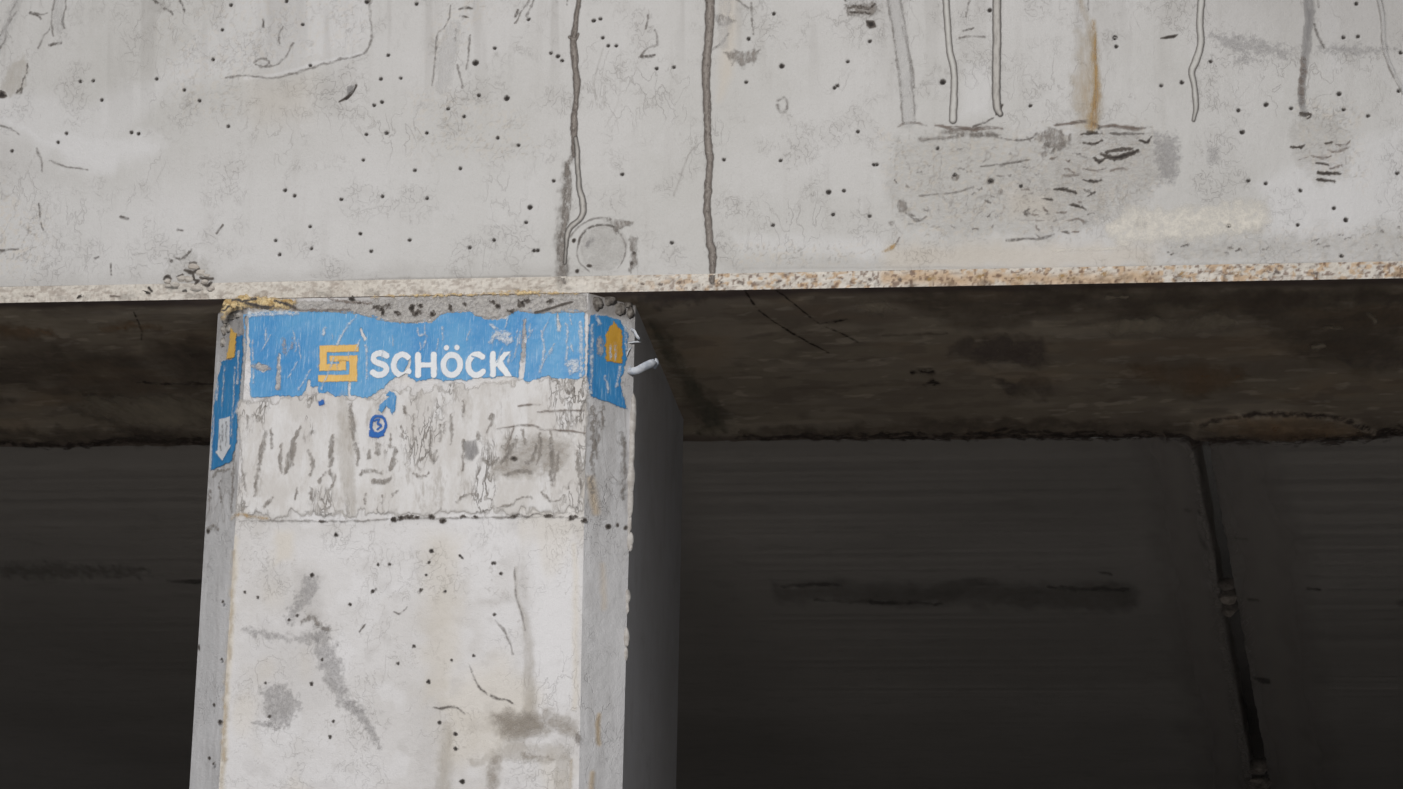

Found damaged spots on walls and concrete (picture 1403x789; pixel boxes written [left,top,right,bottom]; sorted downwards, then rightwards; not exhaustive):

damp [889,1,915,121]
damp [943,0,958,124]
damp [992,0,1003,117]
rust [1088,22,1099,129]
damp [1188,0,1205,122]
damp [1298,0,1324,116]
crack [557,0,587,283]
crack [702,0,732,284]
crack [745,290,853,351]